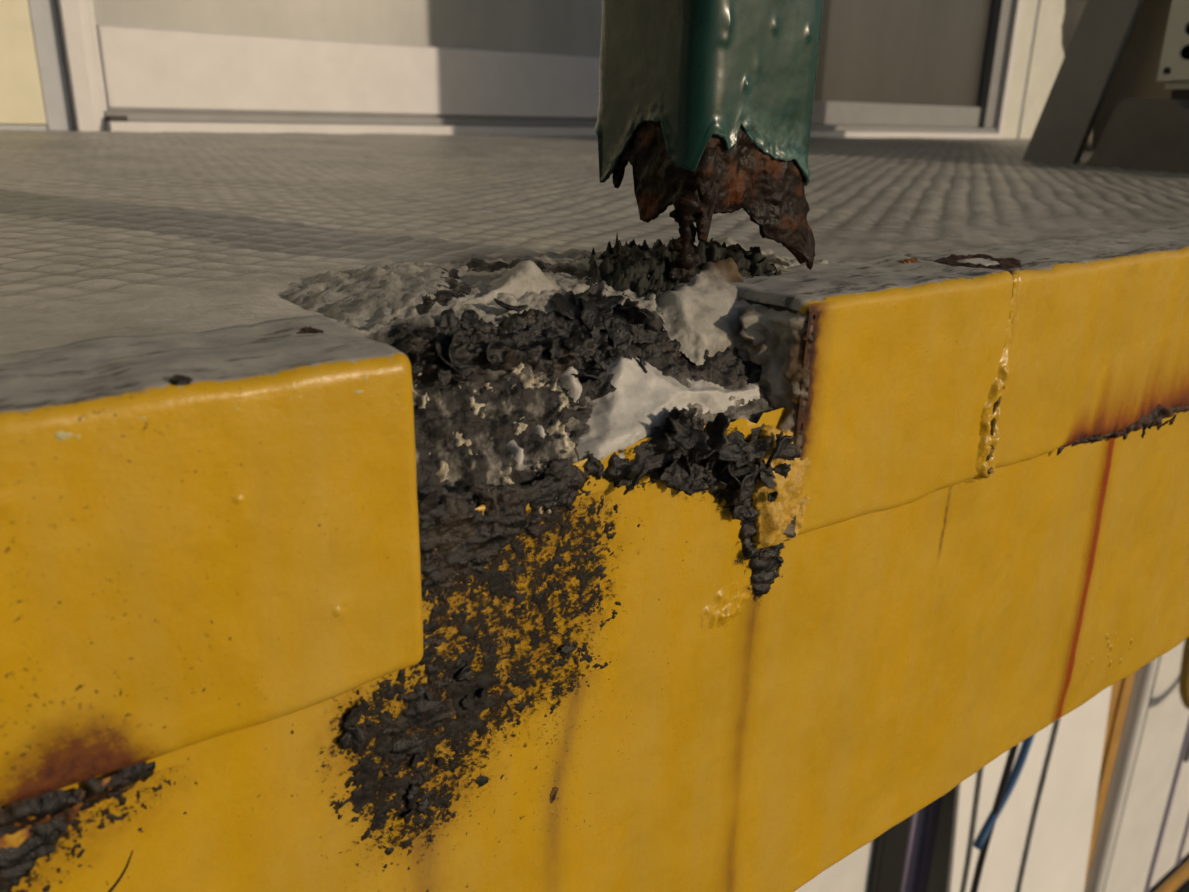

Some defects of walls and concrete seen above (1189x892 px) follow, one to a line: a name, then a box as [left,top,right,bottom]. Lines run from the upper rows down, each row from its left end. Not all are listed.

corrosion [612,121,815,270]
peeling [54,431,81,441]
spalling [279,237,829,872]
corrosion [602,304,824,605]
corrosion [1055,383,1189,720]
corrosion [0,727,151,849]